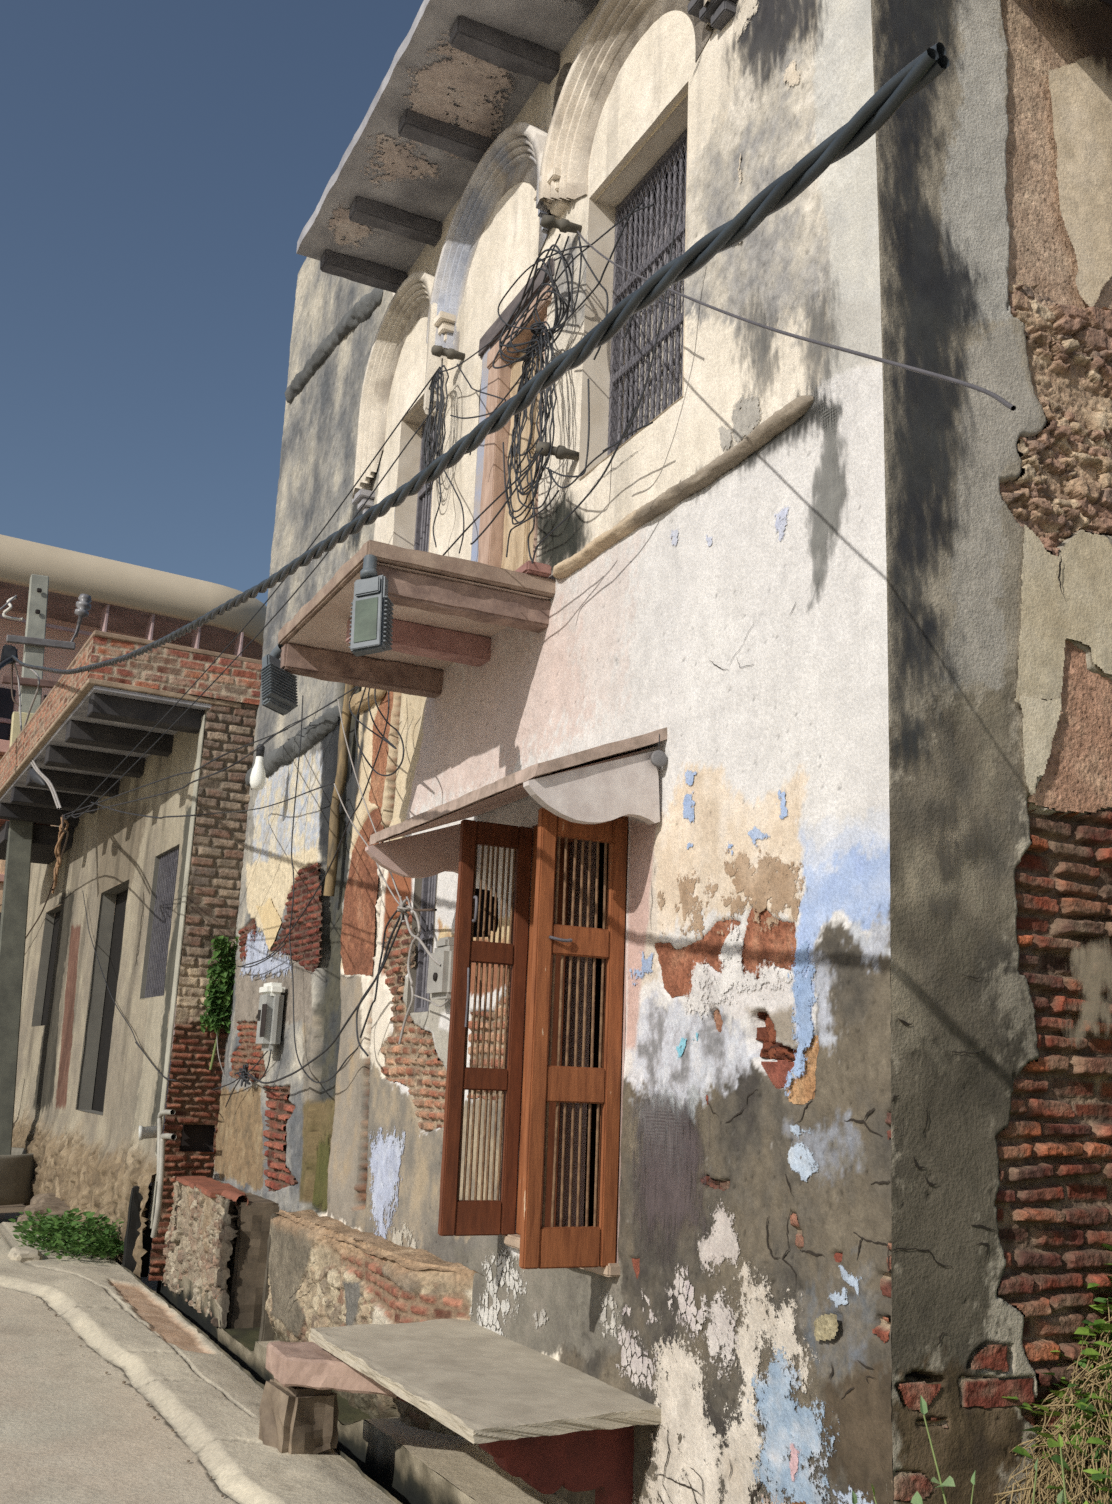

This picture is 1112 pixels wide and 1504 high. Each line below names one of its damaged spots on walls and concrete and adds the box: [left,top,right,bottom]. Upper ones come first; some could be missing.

peeling [394,30,517,140]
damp [726,0,822,86]
damp [874,0,985,767]
damp [535,492,587,573]
flaking render [898,0,1112,1481]
flaking render [229,691,447,1249]
peeling [629,826,819,1105]
flaking render [468,991,509,1069]
peeling [787,1124,819,1182]
crack [844,1095,937,1186]
crack [766,1174,996,1291]
peeling [598,1176,873,1504]